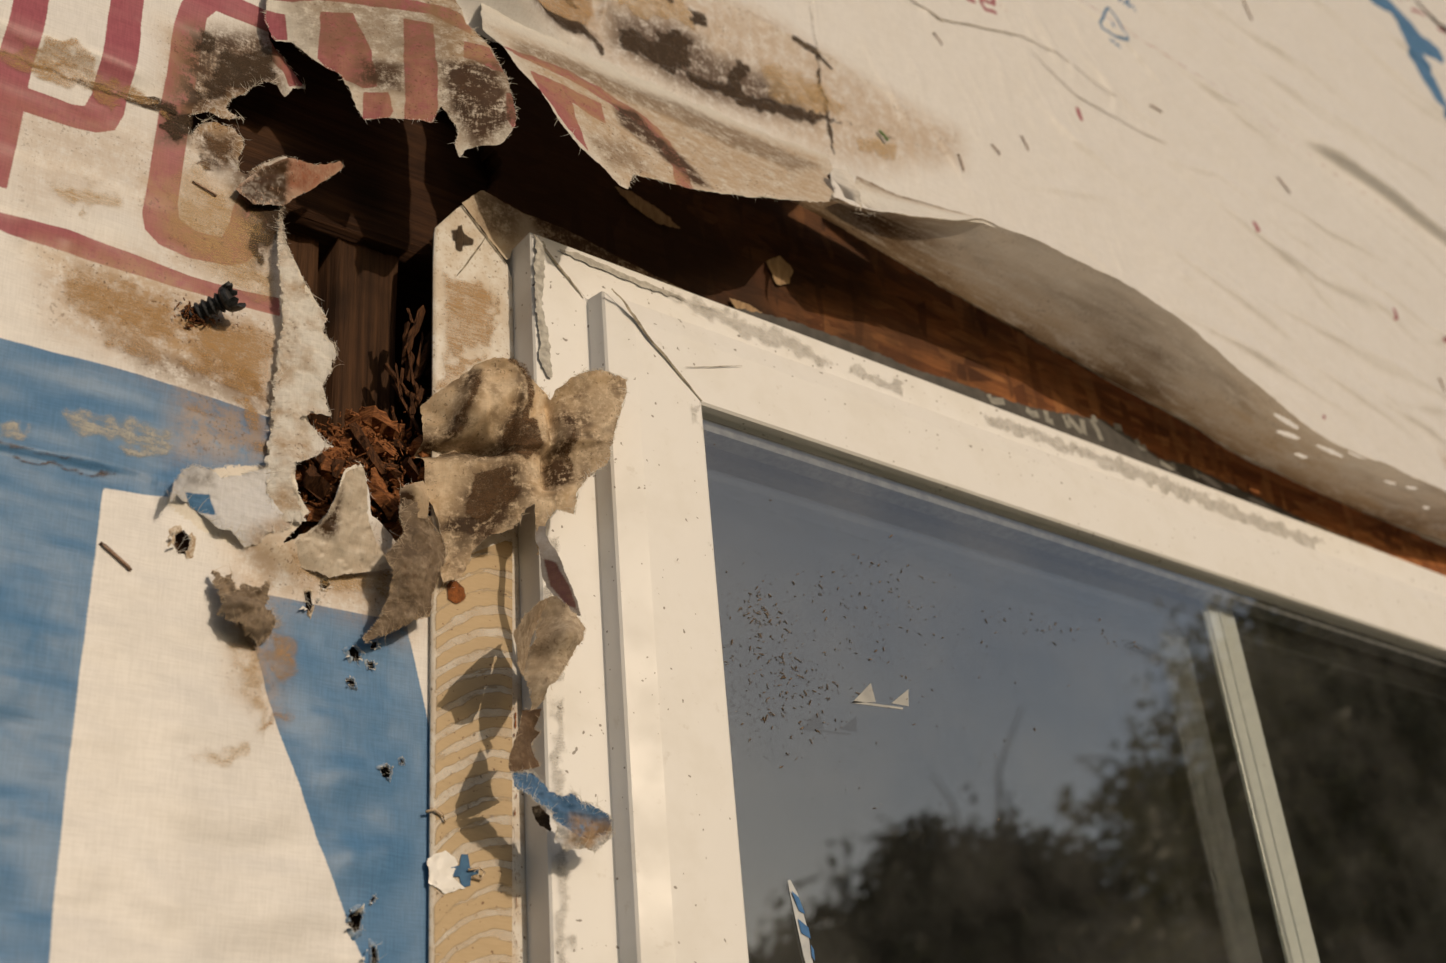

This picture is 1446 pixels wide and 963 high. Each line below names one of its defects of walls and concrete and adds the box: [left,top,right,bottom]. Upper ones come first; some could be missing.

leakage [538,0,604,55]
leakage [619,0,851,154]
hole [394,380,427,483]